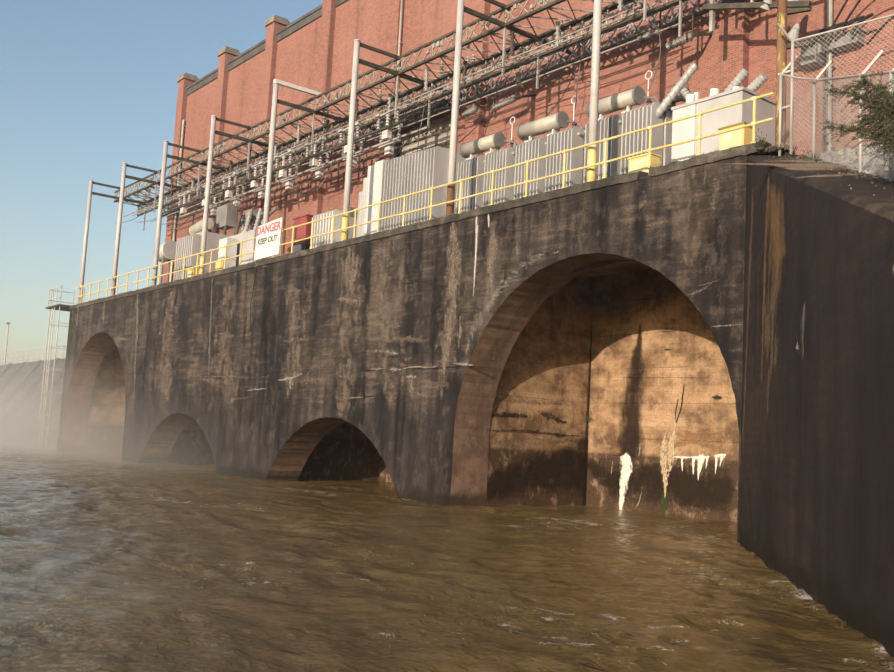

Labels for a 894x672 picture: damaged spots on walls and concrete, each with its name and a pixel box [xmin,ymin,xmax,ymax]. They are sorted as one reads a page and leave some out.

leakage [486,326,733,510]